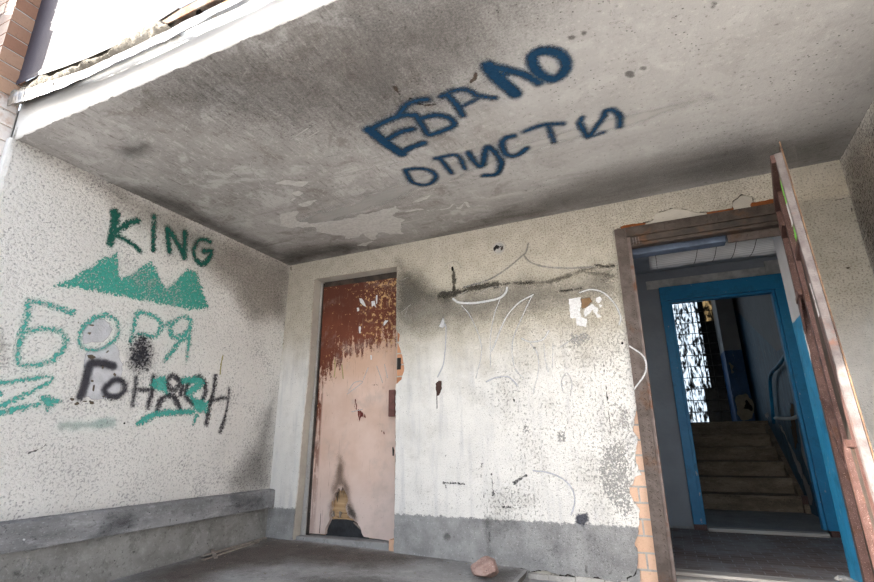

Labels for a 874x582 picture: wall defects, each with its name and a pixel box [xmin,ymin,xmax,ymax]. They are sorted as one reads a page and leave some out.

peeling [274,180,470,246]
spalling [643,208,707,224]
spalling [732,194,754,210]
spalling [599,406,658,582]